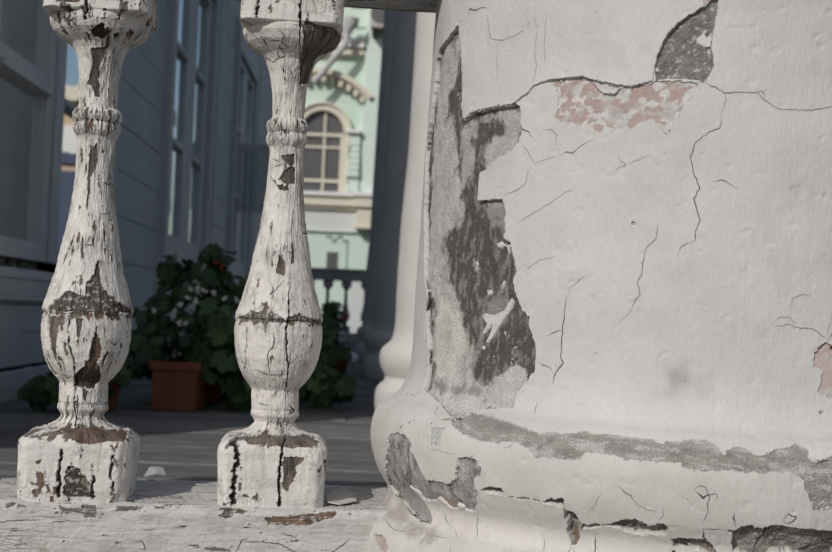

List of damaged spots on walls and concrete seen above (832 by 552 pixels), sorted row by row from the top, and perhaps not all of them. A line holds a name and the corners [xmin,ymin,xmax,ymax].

peeling [298,22,340,85]
crack [677,83,832,256]
spalling [428,32,832,509]
peeling [46,262,131,374]
crack [0,322,79,429]
peeling [75,327,109,401]
crack [55,449,63,497]
crack [88,455,115,498]
crack [229,437,240,504]
peeling [245,434,318,491]
spalling [387,434,481,522]
crack [672,485,736,552]